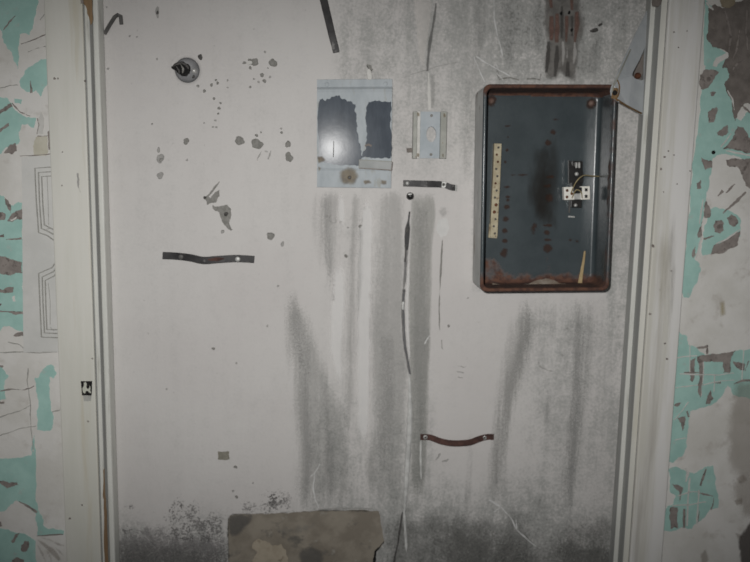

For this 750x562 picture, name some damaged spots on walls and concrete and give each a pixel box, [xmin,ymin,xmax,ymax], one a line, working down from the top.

peeling [0,195,23,337]
peeling [0,0,59,156]
flaking render [203,182,233,234]
flaking render [235,131,271,160]
peeling [682,0,750,298]
peeling [0,365,64,562]
peeling [664,332,750,531]